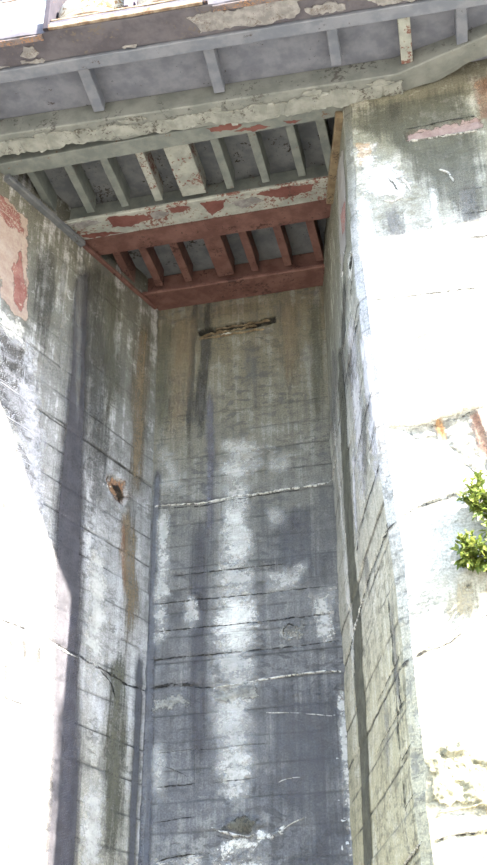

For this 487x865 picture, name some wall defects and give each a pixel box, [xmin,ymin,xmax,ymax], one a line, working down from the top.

peeling [186,0,346,33]
spalling [407,116,483,142]
peeling [200,184,314,216]
peeling [68,206,190,238]
spalling [198,317,276,340]
damp [35,255,378,865]